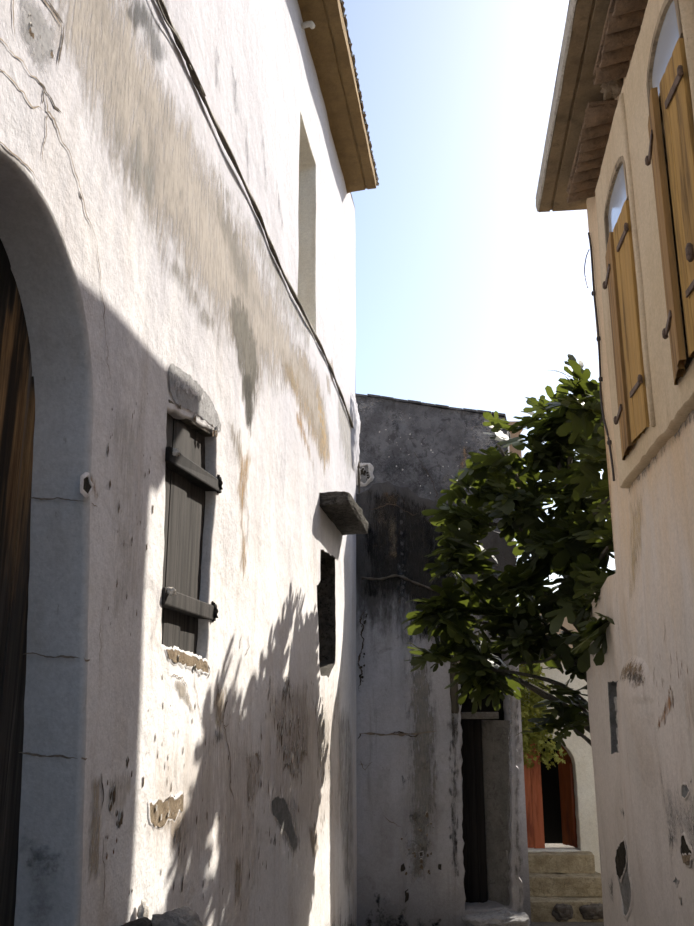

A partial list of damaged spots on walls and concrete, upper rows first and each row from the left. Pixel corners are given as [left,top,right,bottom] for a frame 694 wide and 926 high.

crack [0,38,110,371]
leakage [51,0,333,450]
leakage [232,426,248,511]
spalling [162,646,210,724]
crack [358,610,368,689]
peeling [106,780,123,859]
spalling [145,754,186,856]
peeling [248,676,304,857]
crack [348,731,435,799]
spalling [615,835,633,923]